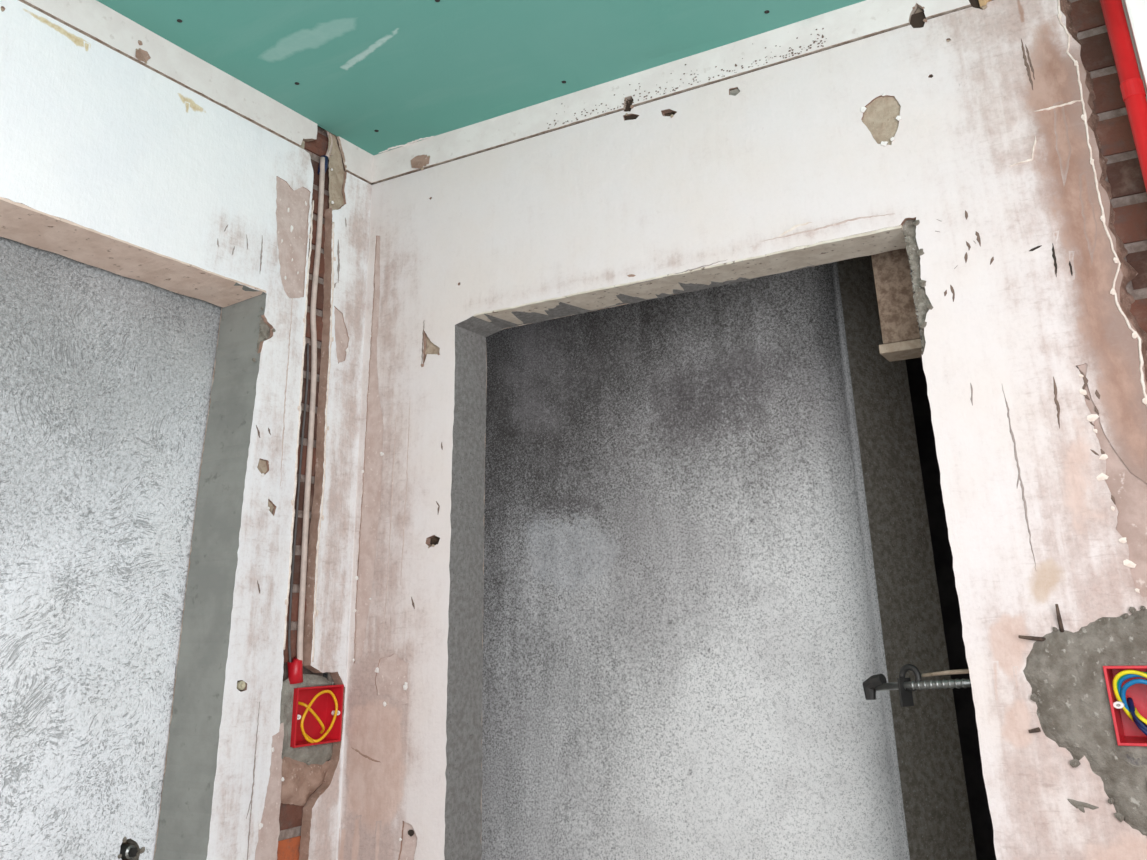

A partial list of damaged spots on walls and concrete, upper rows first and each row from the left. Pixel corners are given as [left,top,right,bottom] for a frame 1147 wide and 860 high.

flaking render [861,93,901,146]
spalling [903,220,933,355]
flaking render [276,125,349,663]
flaking render [257,459,271,477]
crack [1002,386,1036,569]